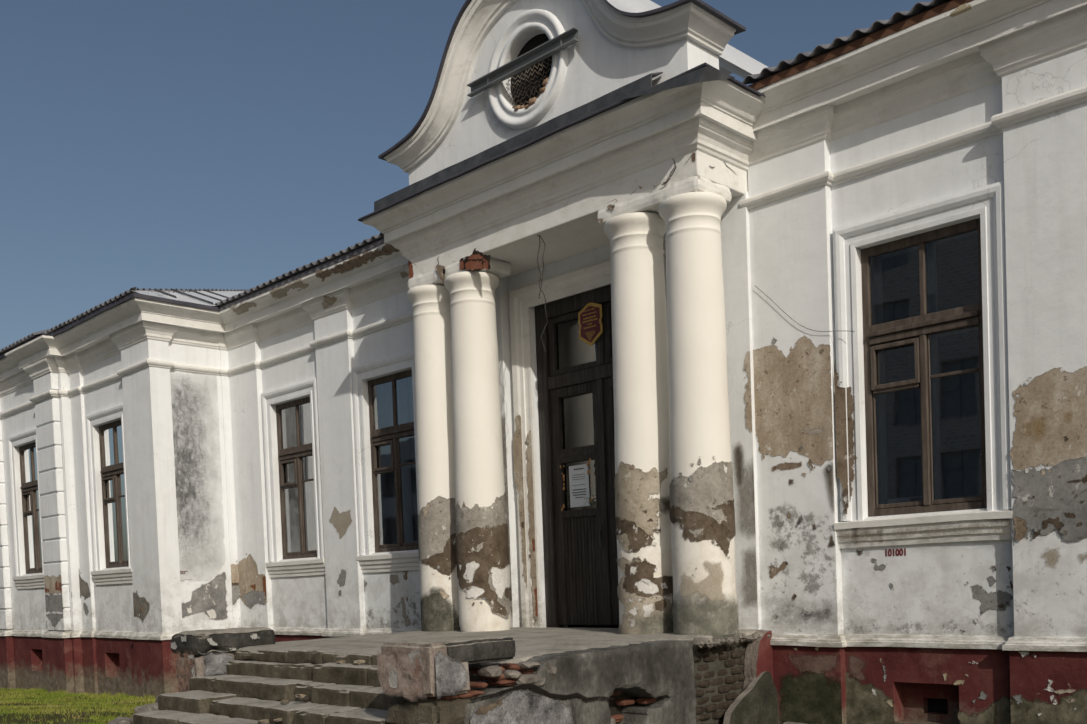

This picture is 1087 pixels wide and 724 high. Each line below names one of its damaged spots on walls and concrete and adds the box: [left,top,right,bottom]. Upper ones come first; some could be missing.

crack [612,156,736,202]
flaking render [459,248,490,271]
peeling [744,335,857,514]
leakage [172,392,205,536]
peeling [1010,366,1087,566]
peeling [330,507,352,538]
peeling [417,415,538,623]
peeling [614,457,736,634]
peeling [133,591,149,622]
peeling [231,554,267,609]
crack [470,676,614,724]
peeling [958,679,1087,724]